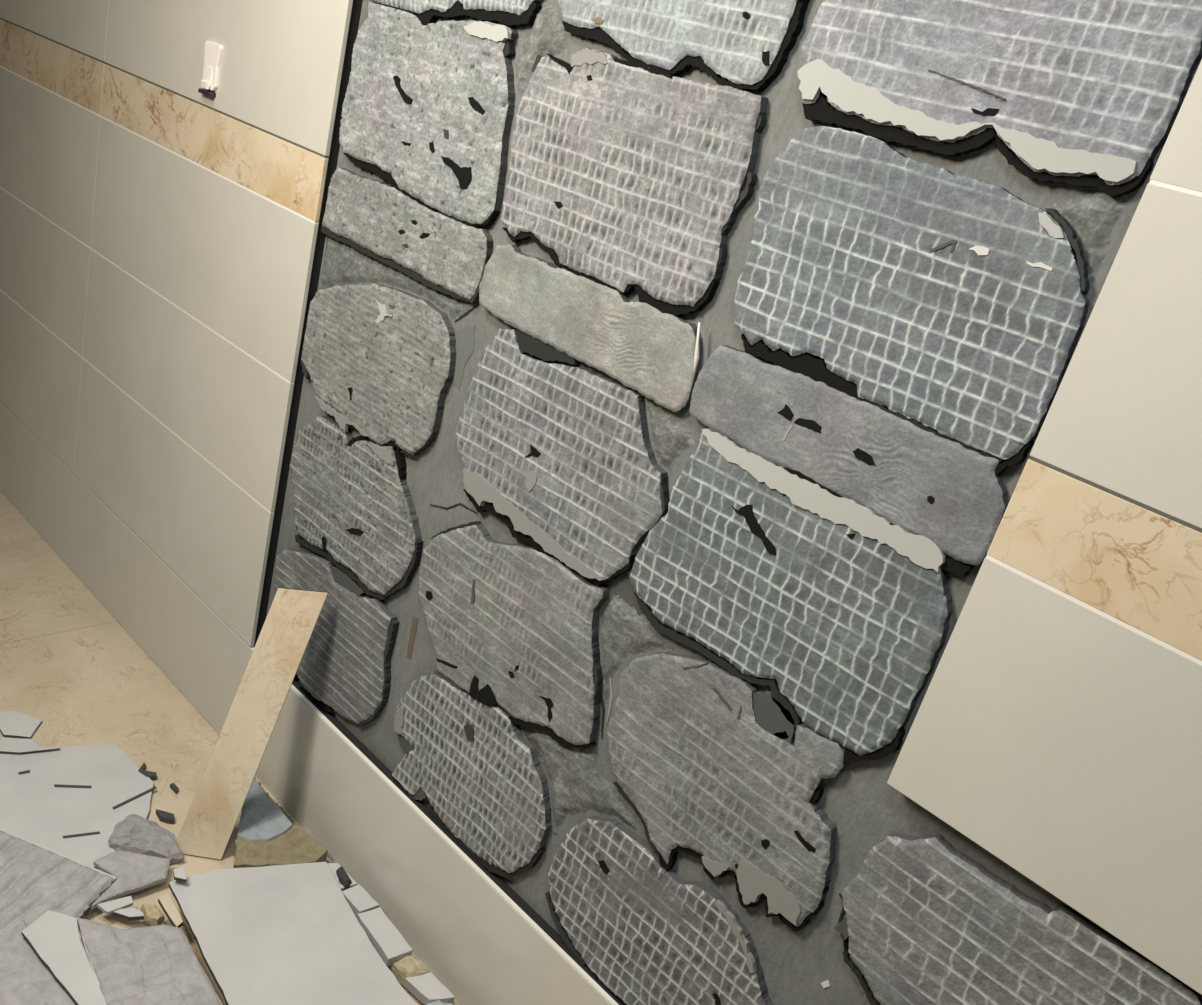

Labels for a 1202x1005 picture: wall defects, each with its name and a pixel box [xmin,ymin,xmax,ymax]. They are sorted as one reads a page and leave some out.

spalling [503,41,516,58]
hole [441,156,472,189]
spalling [732,505,776,555]
spalling [330,566,366,596]
spalling [434,670,498,706]
spalling [464,723,474,741]
spalling [753,691,796,744]